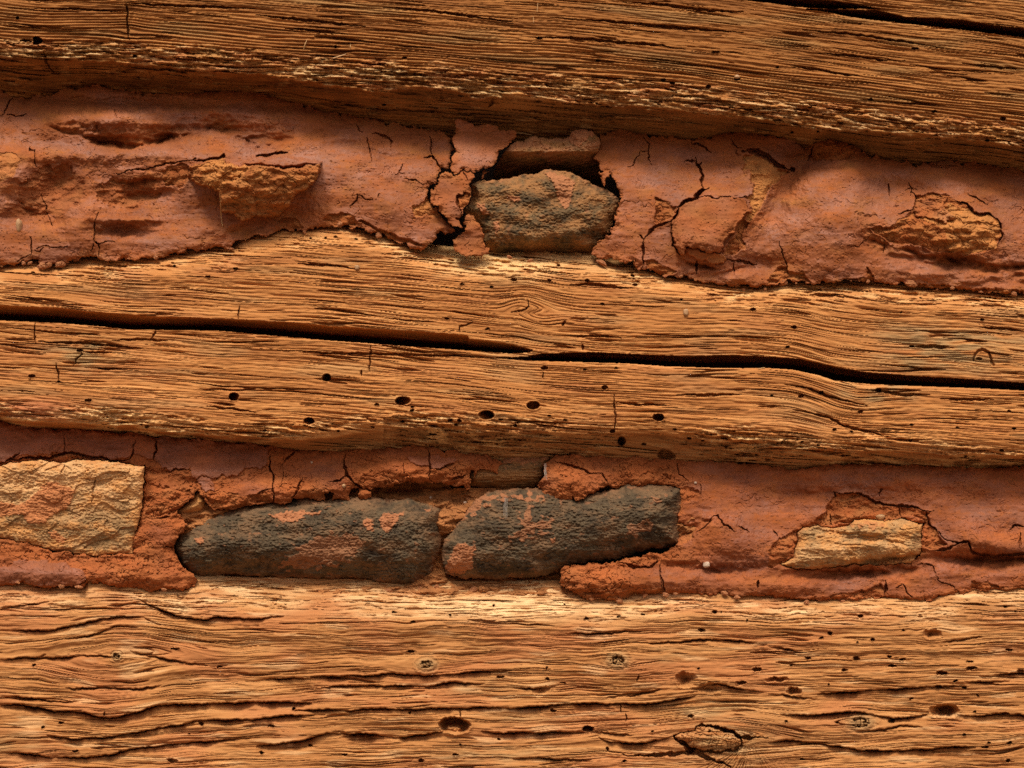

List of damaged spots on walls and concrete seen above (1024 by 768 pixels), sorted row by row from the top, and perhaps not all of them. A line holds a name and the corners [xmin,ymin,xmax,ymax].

crack [17,194,114,263]
crack [116,154,226,175]
spalling [189,159,322,223]
crack [256,150,288,158]
crack [571,136,814,289]
spalling [870,193,1002,257]
crack [957,194,1004,247]
crack [0,306,1024,455]
peeling [0,420,272,517]
crack [258,451,303,503]
crack [333,455,366,490]
spalling [767,493,948,569]